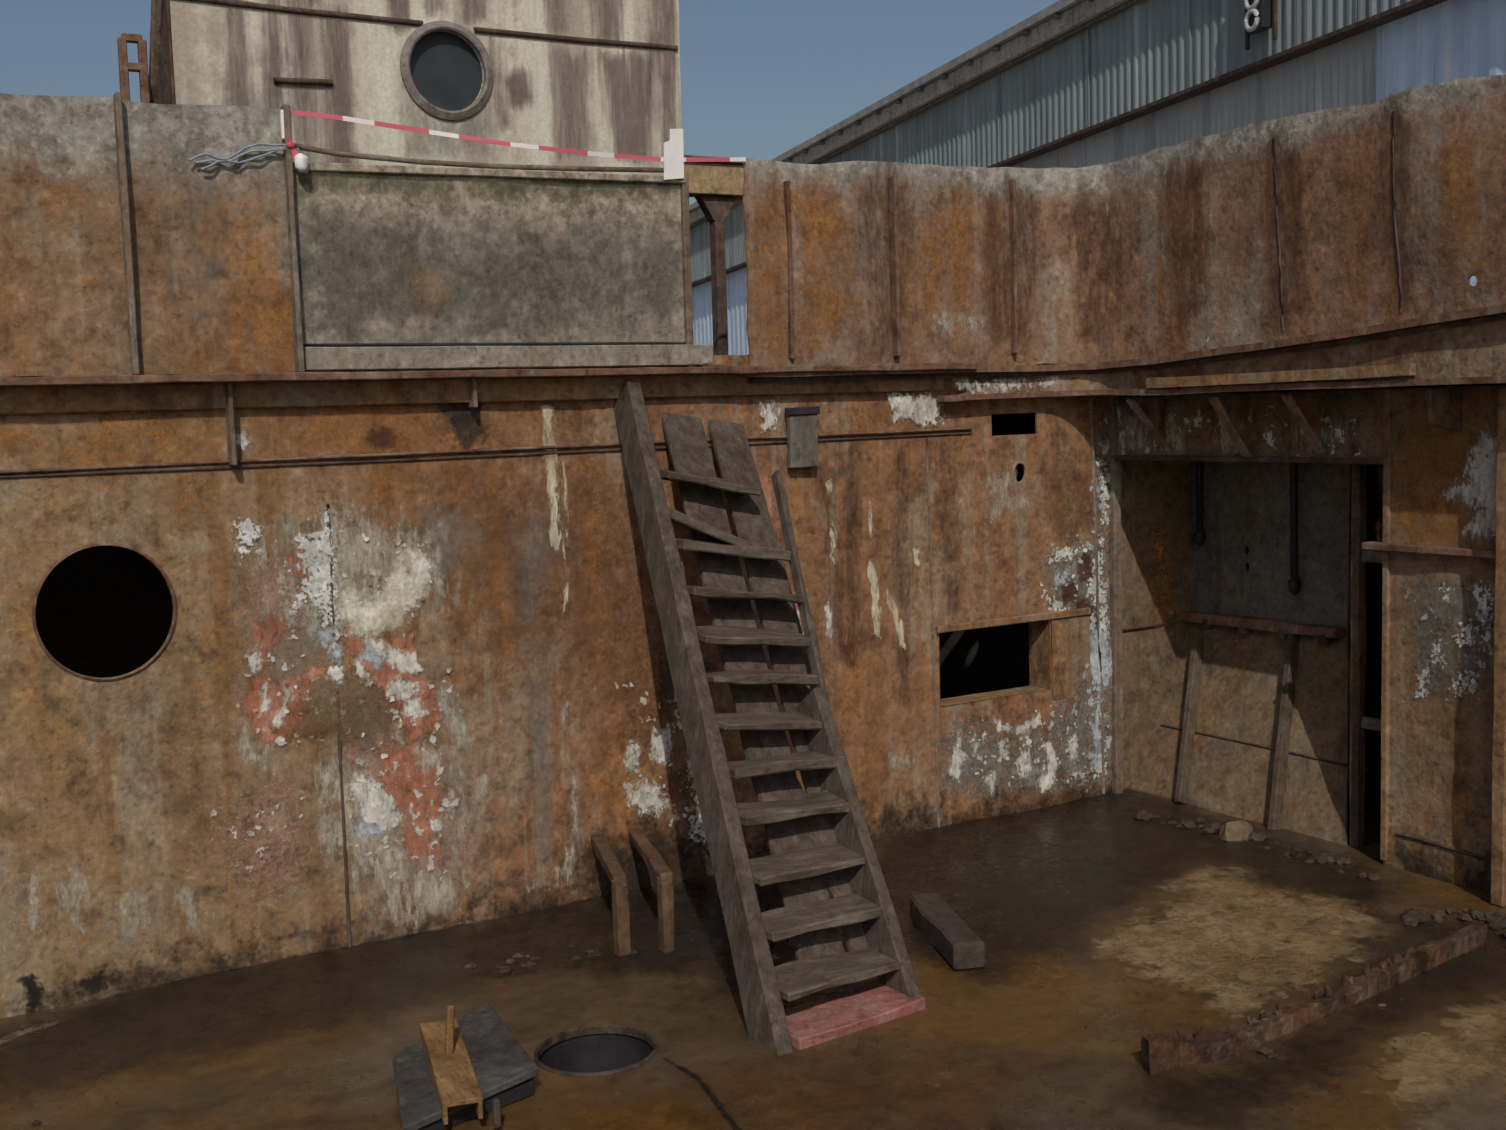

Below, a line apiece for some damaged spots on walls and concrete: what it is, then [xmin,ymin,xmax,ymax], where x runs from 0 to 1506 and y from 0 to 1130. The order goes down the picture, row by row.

peeling [760,405,781,432]
peeling [888,392,943,426]
peeling [1248,406,1372,457]
peeling [939,407,1239,808]
peeling [1401,573,1495,706]
peeling [211,502,476,926]
peeling [615,682,709,849]
rust [20,973,44,1013]
rust [81,970,108,995]
crack [668,1061,741,1130]